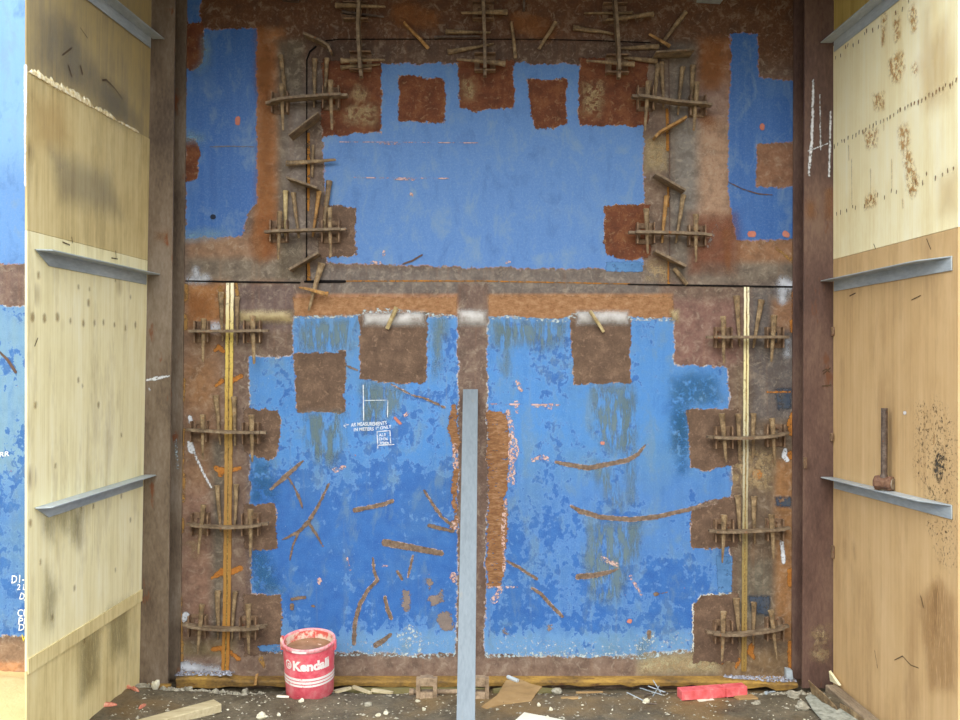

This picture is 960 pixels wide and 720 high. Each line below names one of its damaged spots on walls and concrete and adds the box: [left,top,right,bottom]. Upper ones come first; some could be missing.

peeling [95,106,139,133]
damp [905,152,917,193]
rust [484,400,519,589]
damp [917,404,952,500]